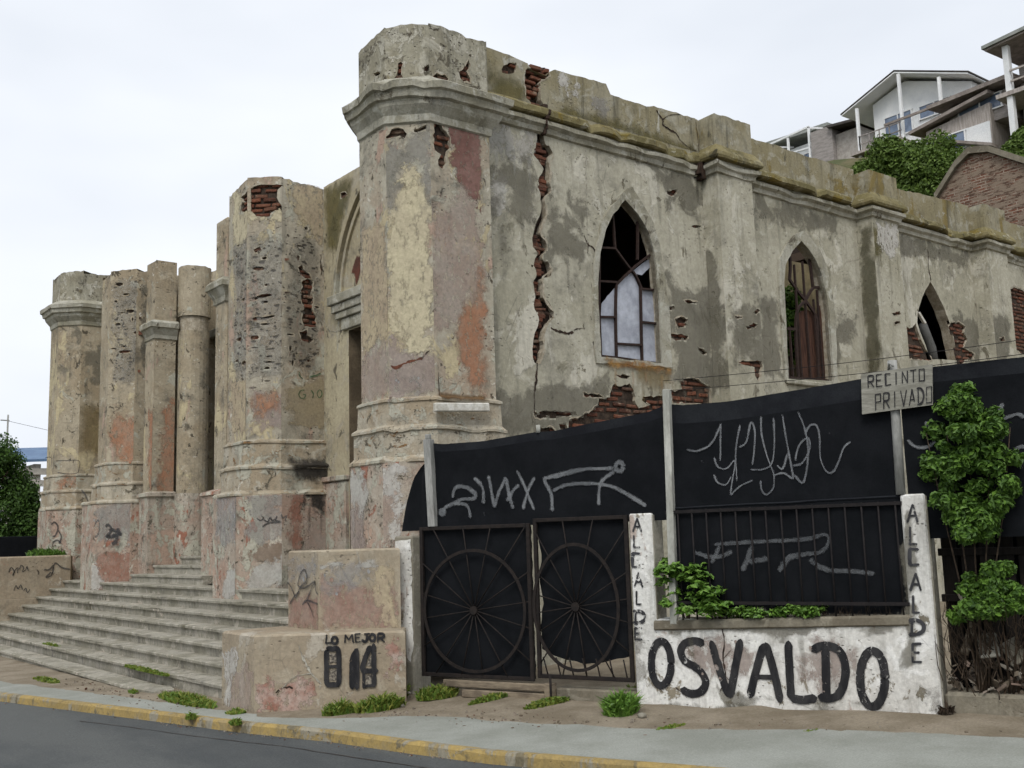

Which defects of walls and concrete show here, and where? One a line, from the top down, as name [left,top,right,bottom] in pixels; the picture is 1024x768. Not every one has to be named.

flaking render [502,64,580,106]
crack [656,110,699,151]
peeling [385,123,483,212]
leakage [489,124,588,264]
leakage [636,161,703,215]
leakage [755,194,837,239]
crack [532,104,581,416]
peeling [232,184,324,432]
leakage [640,250,783,395]
flaking render [1000,285,1024,355]
flaking render [533,374,712,432]
leakage [289,458,329,481]